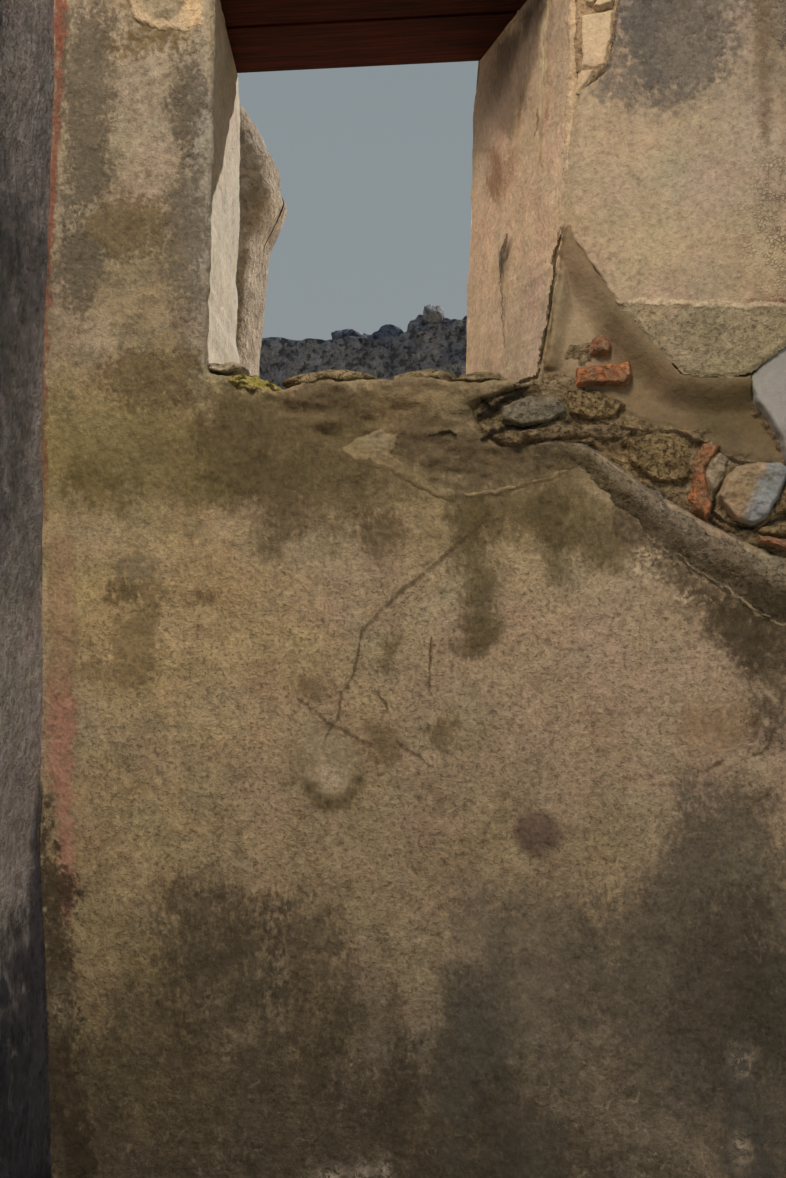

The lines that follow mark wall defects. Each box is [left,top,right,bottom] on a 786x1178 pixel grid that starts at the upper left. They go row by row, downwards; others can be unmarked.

flaking render [574,0,620,94]
water stain [593,0,786,111]
water stain [0,0,208,541]
water stain [199,388,405,556]
crack [299,525,480,743]
water stain [393,409,786,742]
spalling [471,234,786,557]
water stain [0,782,96,1178]
water stain [561,780,786,1178]
efflorescence [320,1162,389,1178]